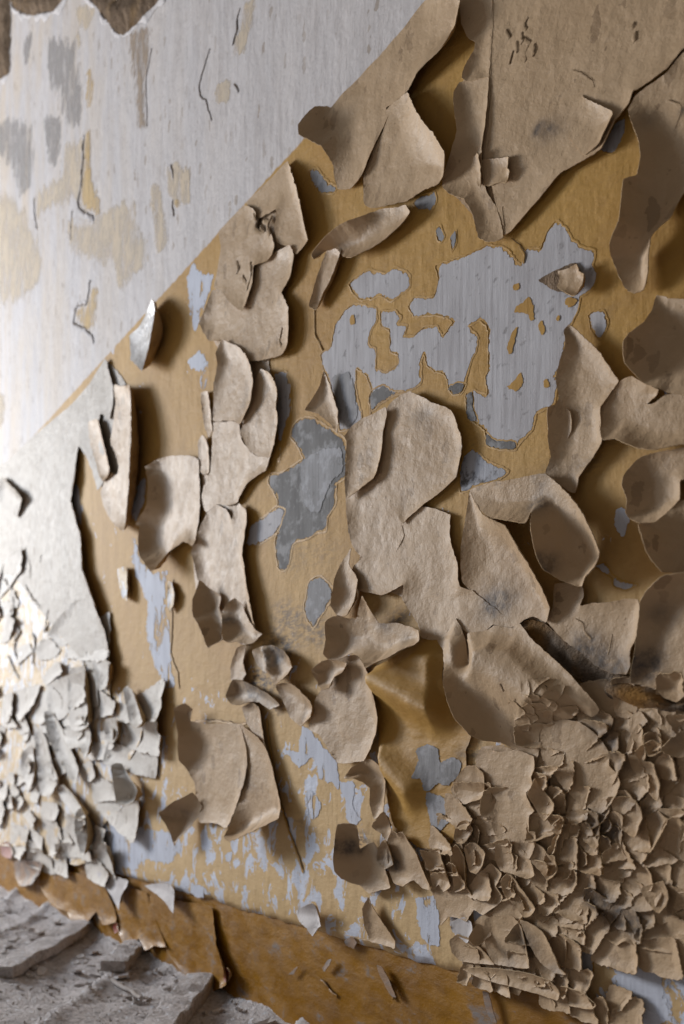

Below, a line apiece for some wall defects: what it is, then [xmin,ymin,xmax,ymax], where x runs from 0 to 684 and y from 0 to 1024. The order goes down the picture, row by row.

peeling [0,359,378,991]
flaking render [187,0,684,1024]